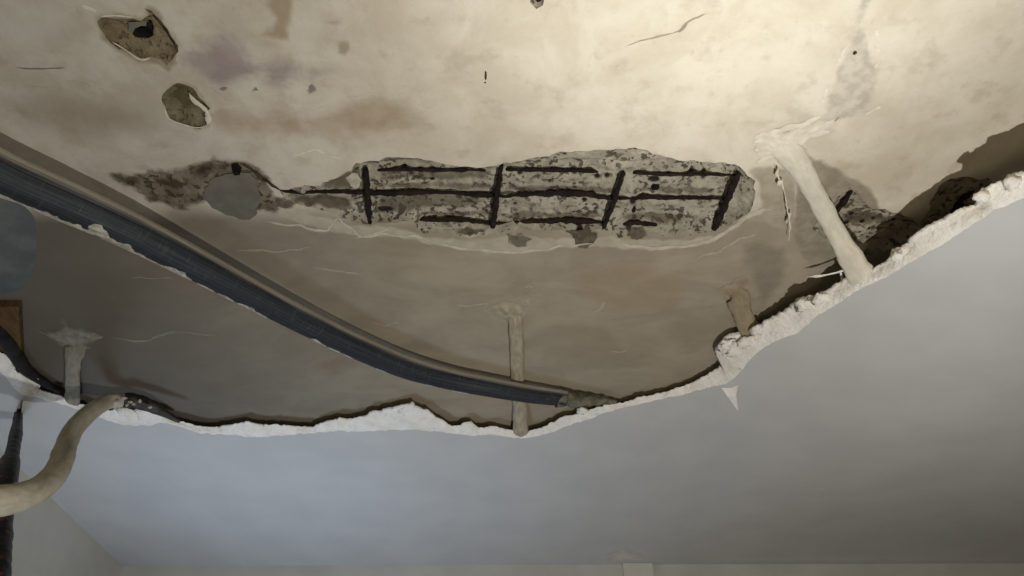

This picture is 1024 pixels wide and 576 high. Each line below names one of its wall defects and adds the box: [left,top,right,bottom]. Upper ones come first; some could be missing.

flaking render [81,4,178,66]
crack [625,14,705,47]
flaking render [162,83,212,129]
spalling [99,147,1024,438]
flaking render [0,352,85,410]